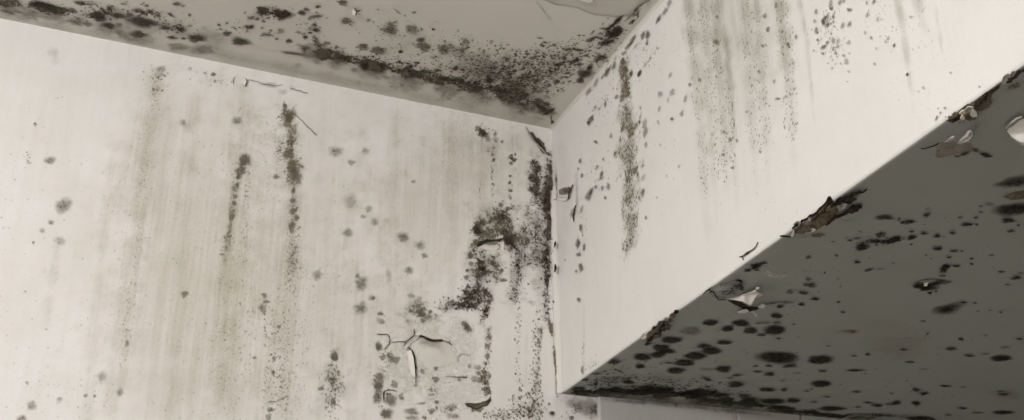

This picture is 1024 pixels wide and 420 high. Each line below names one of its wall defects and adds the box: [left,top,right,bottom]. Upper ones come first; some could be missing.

water stain [0,0,204,42]
water stain [217,0,666,255]
spalling [921,69,1024,158]
water stain [275,104,317,293]
spalling [780,189,867,238]
water stain [846,206,982,277]
water stain [997,204,1024,232]
water stain [1001,178,1024,187]
water stain [405,128,934,420]
peeling [728,287,766,316]
spalling [640,310,679,347]
peeling [465,396,491,412]